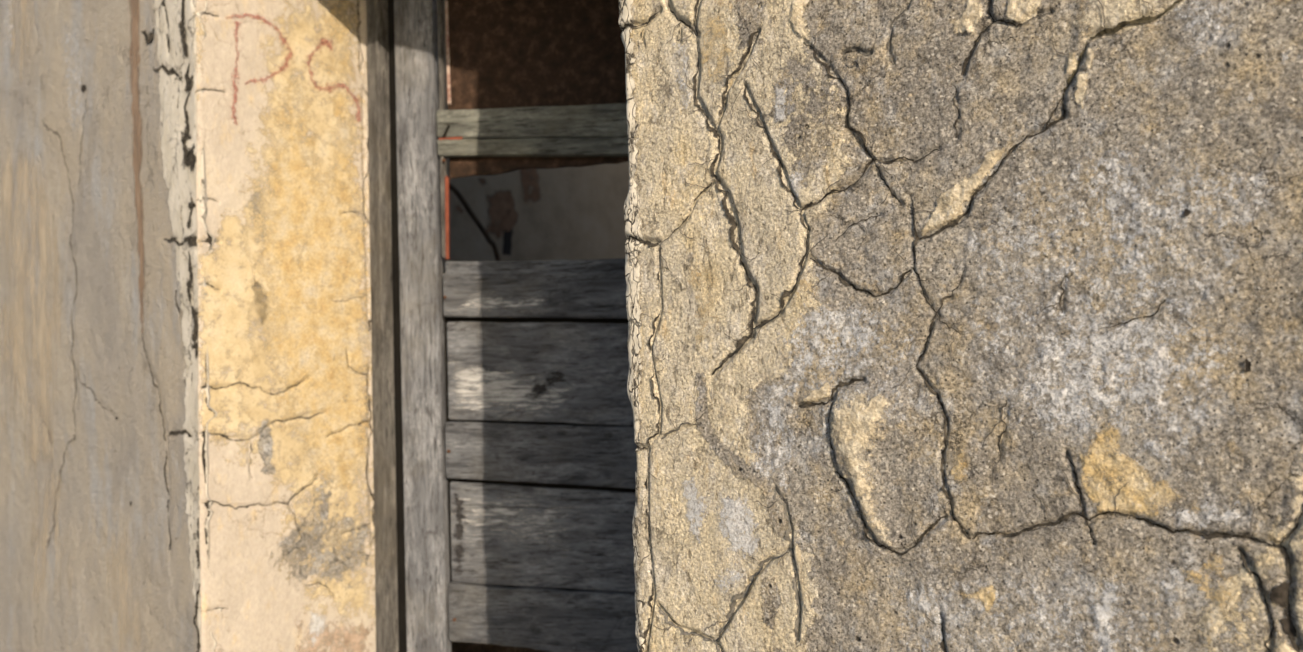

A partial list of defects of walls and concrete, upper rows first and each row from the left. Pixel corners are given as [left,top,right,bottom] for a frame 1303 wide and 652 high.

crack [42,99,112,547]
peeling [154,0,276,652]
crack [141,0,375,652]
crack [622,0,1303,652]
flaking render [682,0,1303,652]